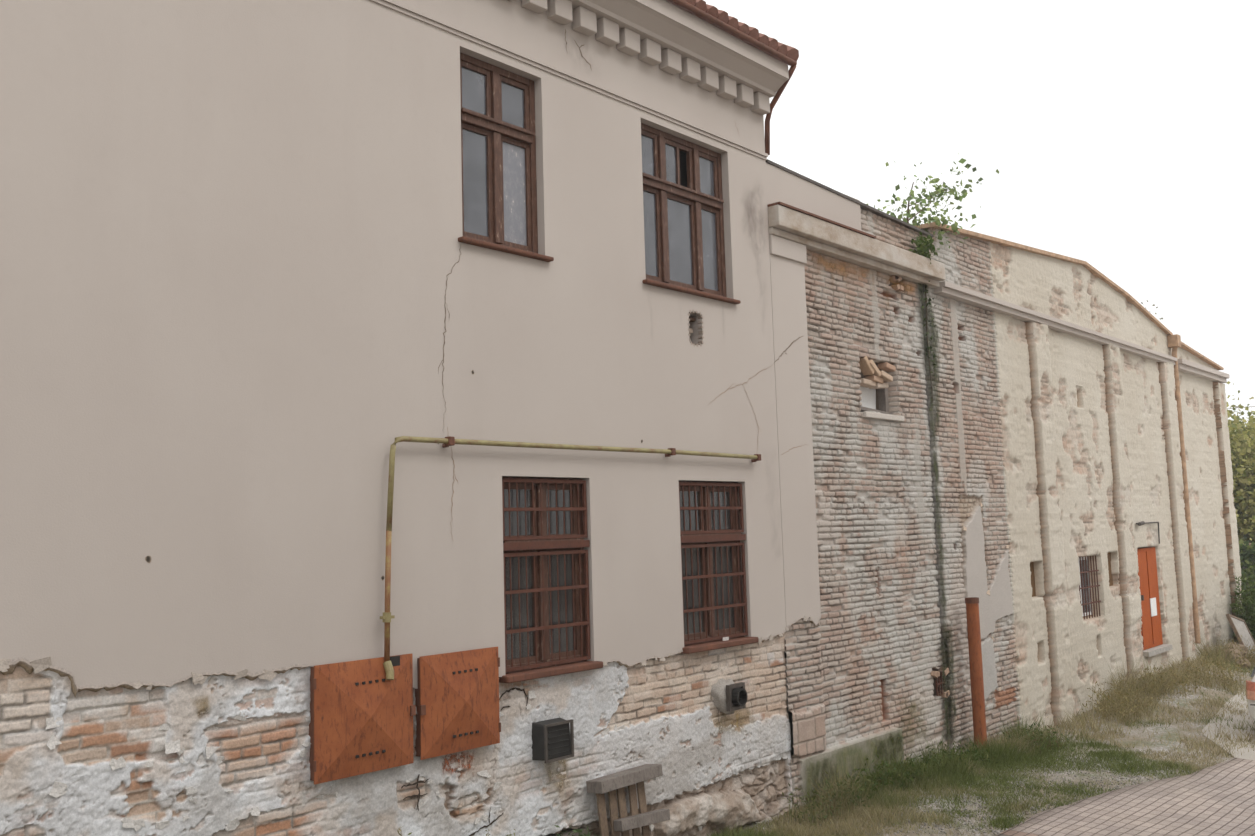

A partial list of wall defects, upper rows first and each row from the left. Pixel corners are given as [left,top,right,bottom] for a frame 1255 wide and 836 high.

crack [438,247,461,540]
crack [708,336,806,465]
spalling [0,823,47,836]
spalling [0,656,311,832]
spalling [212,792,338,836]
spalling [396,767,502,824]
spalling [499,680,537,721]
spalling [594,616,821,736]